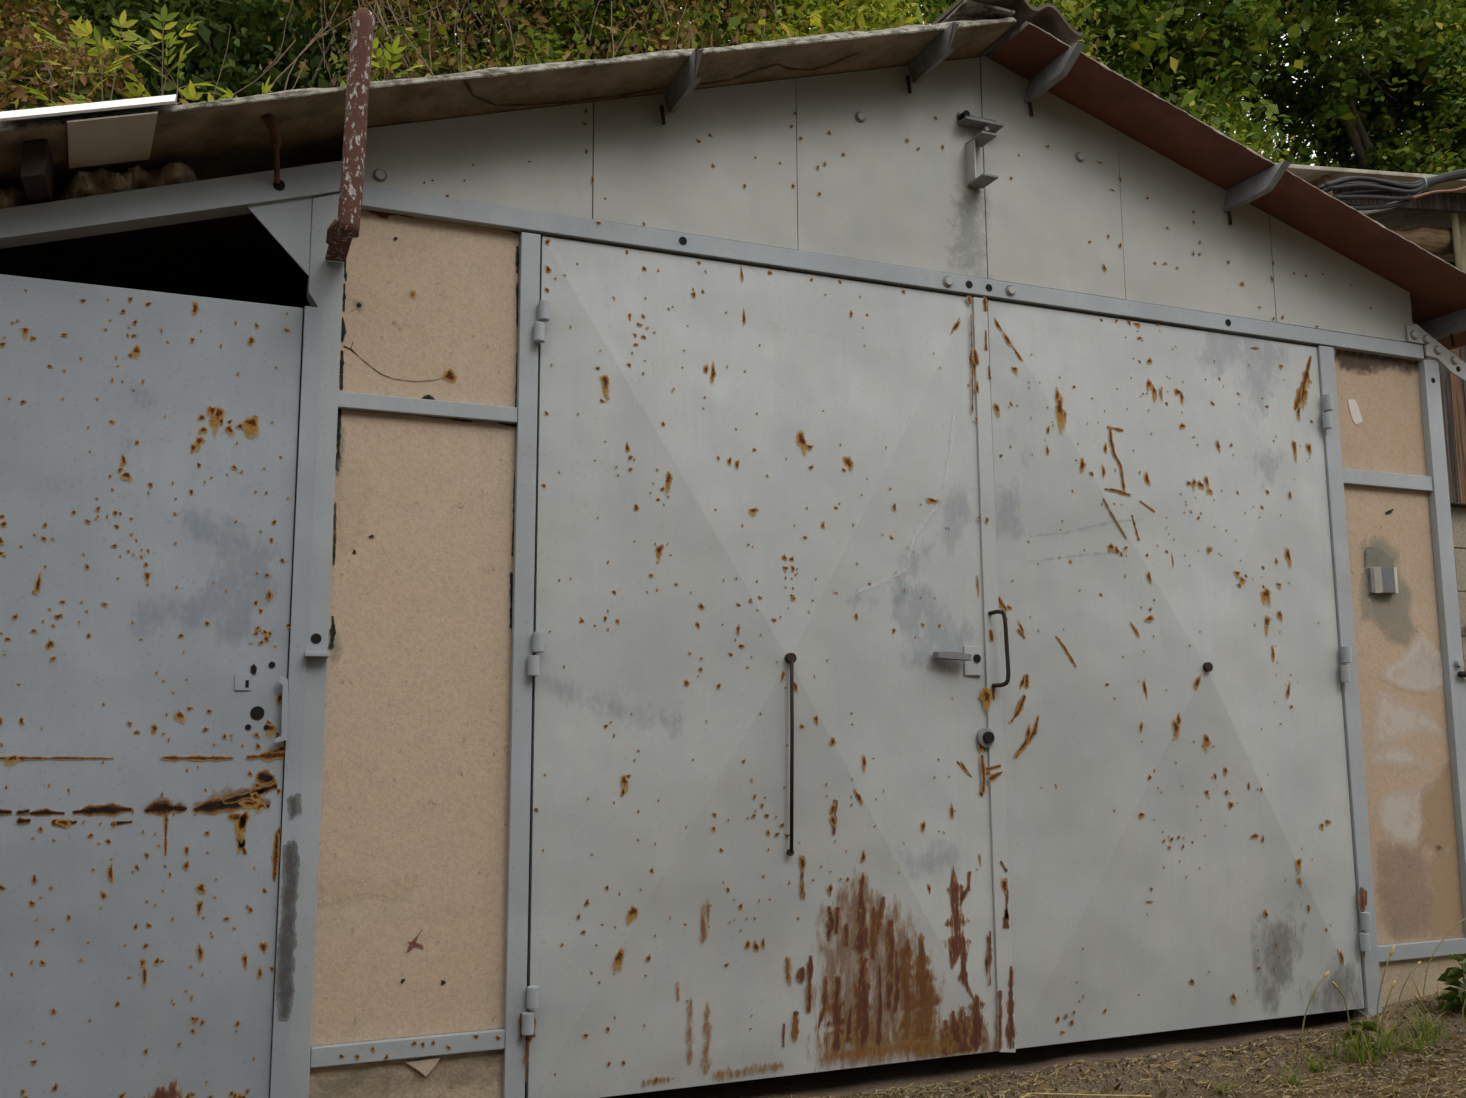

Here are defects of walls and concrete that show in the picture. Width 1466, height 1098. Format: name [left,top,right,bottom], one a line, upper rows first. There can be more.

rust [71,440,153,586]
rust [104,297,152,392]
rust [171,405,274,515]
rust [950,296,1076,456]
rust [1273,436,1312,462]
rust [1297,371,1313,423]
rust [249,519,291,648]
rust [1234,548,1298,725]
rust [0,693,285,987]
rust [676,755,1017,1080]
rust [148,1079,250,1098]